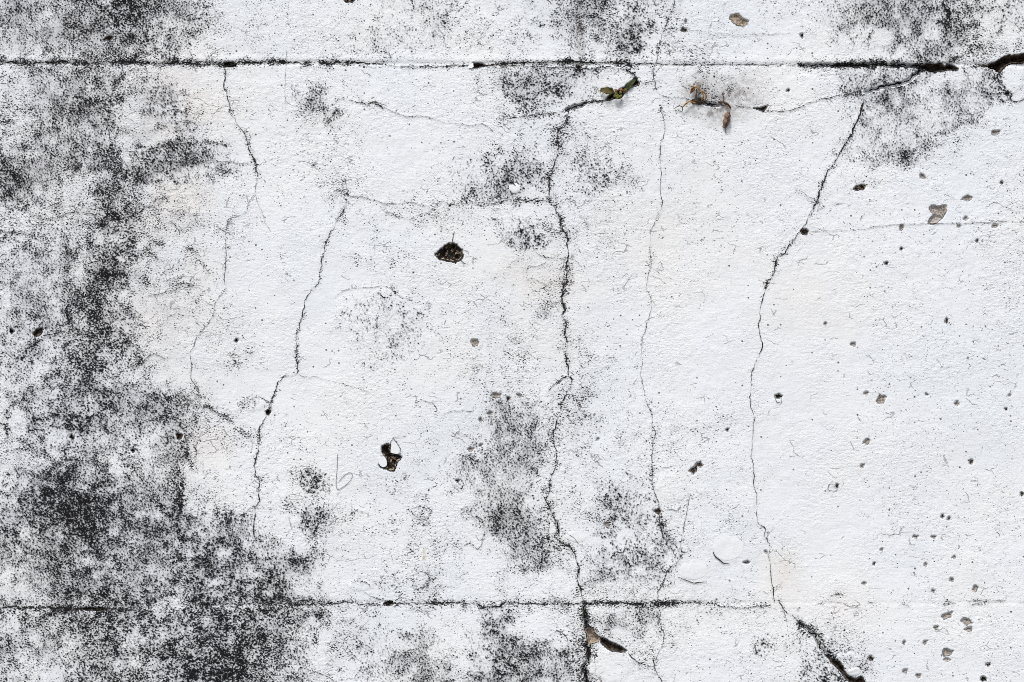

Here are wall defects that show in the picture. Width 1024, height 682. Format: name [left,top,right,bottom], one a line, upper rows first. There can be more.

water stain [291,80,349,130]
peeling [730,13,748,26]
water stain [815,0,1024,171]
crack [5,52,468,397]
spalling [435,233,469,264]
crack [736,63,921,423]
peeling [929,205,947,224]
water stain [0,0,331,682]
crack [237,1,864,682]
spalling [378,436,405,471]
water stain [447,398,558,572]
spalling [585,627,600,646]